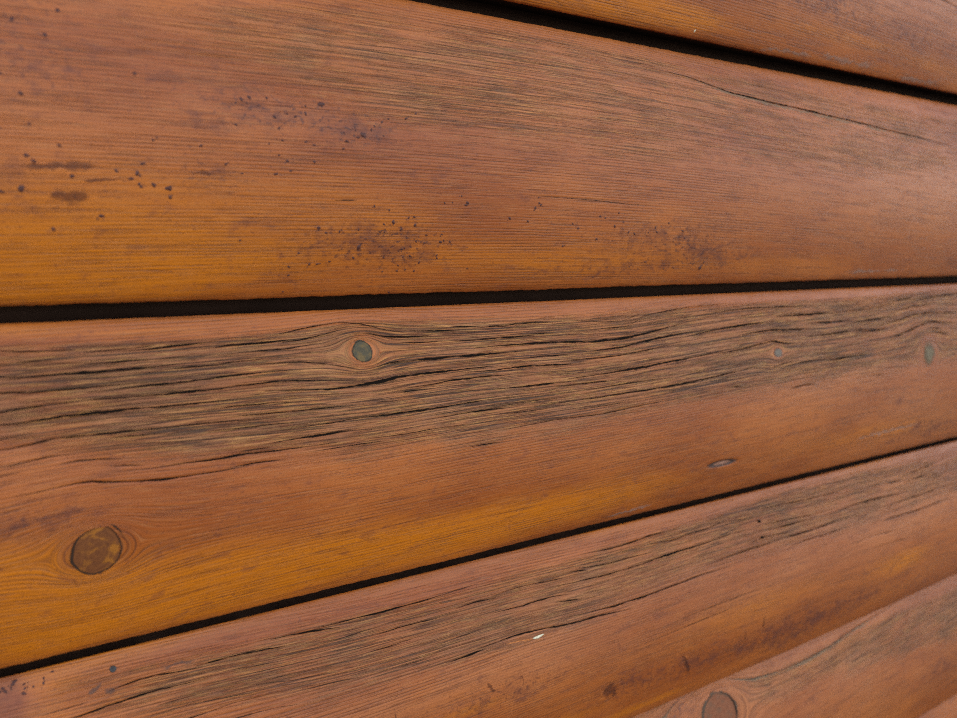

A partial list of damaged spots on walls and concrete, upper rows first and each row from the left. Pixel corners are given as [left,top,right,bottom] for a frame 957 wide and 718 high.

crack [657,69,954,147]
crack [0,294,954,498]
crack [42,459,951,718]